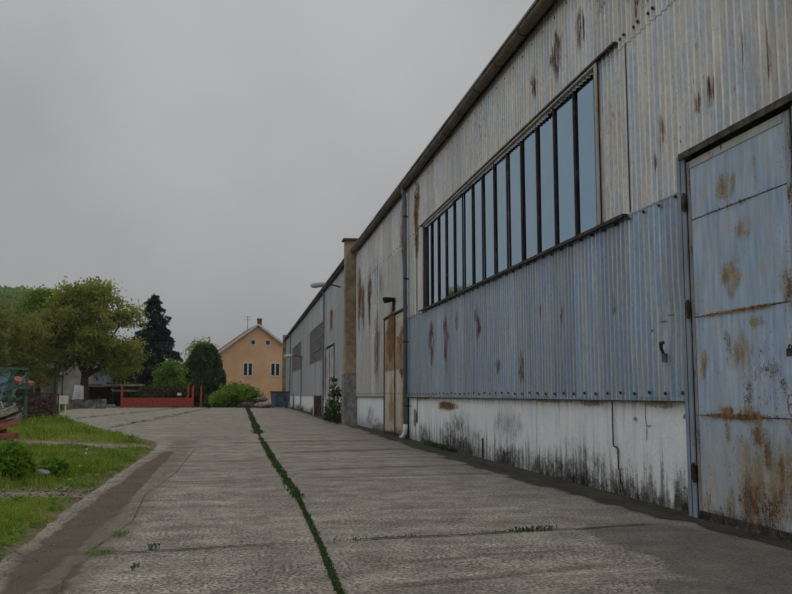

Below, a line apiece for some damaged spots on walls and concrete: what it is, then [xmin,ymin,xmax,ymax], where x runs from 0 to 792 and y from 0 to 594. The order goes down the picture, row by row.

corrosion [550,29,563,78]
corrosion [692,173,775,221]
corrosion [358,256,403,435]
corrosion [691,270,792,533]
leakage [495,443,689,513]